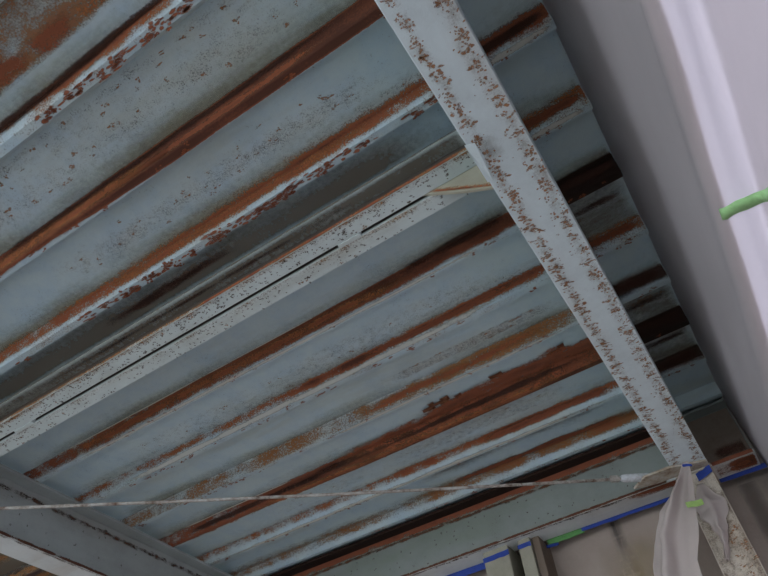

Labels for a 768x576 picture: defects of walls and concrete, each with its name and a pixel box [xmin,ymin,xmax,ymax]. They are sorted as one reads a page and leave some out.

corrosion [0,0,478,365]
corrosion [0,134,680,576]
corrosion [450,3,704,459]